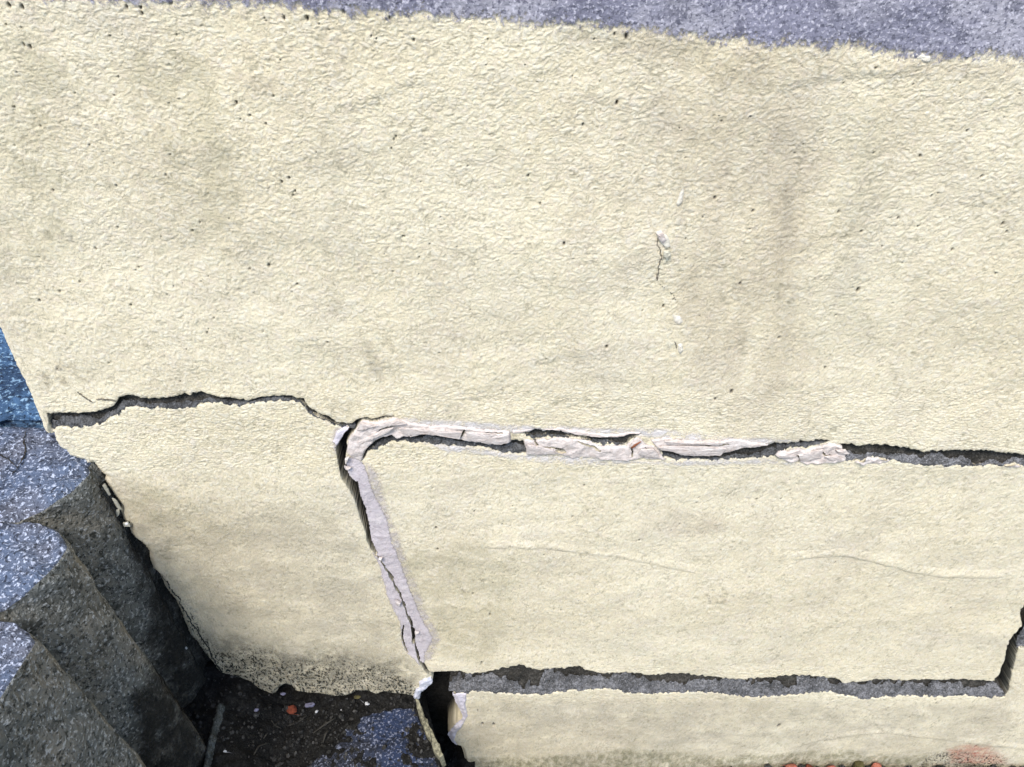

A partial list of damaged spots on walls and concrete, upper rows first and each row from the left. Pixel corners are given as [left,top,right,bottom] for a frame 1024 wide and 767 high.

crack [51,391,1024,467]
peeling [334,417,890,572]
crack [162,576,222,673]
crack [390,573,1005,699]
crack [1016,607,1024,648]